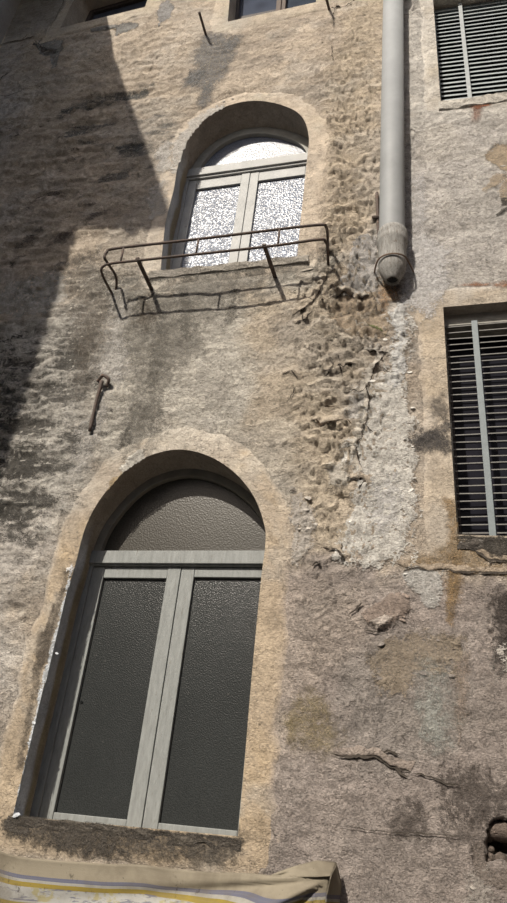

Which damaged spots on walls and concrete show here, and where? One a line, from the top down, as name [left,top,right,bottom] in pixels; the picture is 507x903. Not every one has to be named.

damp [182,33,241,106]
crack [290,268,377,324]
damp [0,249,335,563]
crack [281,364,302,404]
crack [311,343,397,486]
crack [312,541,356,566]
crack [390,547,507,574]
damp [409,497,507,624]
damp [481,588,507,676]
crack [333,745,458,786]
damp [435,762,507,829]
damp [1,814,244,869]